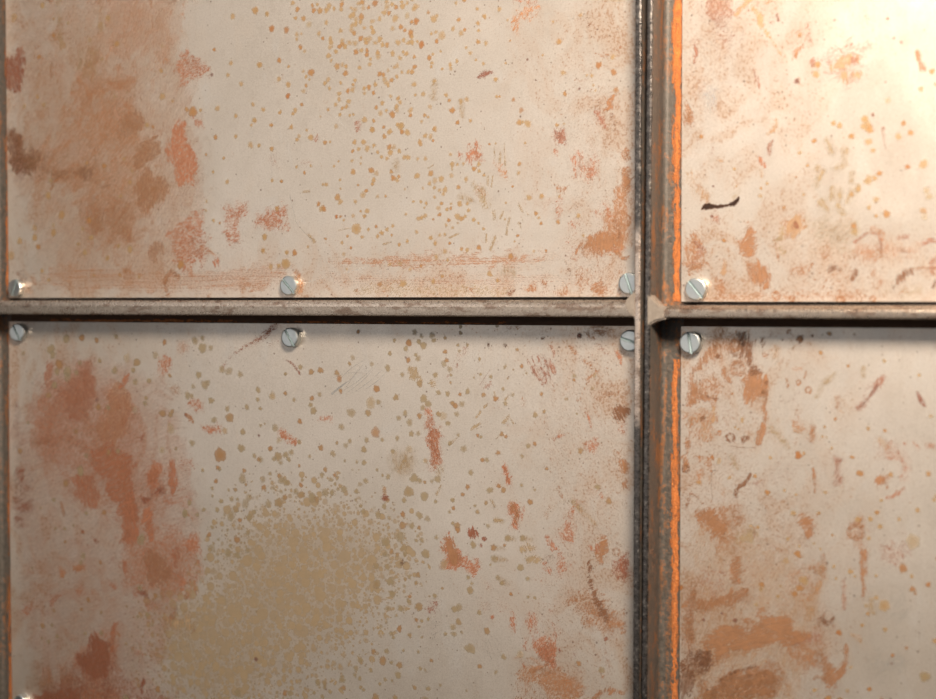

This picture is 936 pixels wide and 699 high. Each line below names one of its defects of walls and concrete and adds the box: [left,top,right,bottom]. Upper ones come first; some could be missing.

corrosion [734,0,781,55]
corrosion [5,47,26,94]
corrosion [553,128,567,153]
corrosion [5,114,42,295]
corrosion [552,147,635,297]
crack [701,196,740,210]
corrosion [822,375,887,437]
corrosion [374,474,441,611]
corrosion [669,327,851,699]
corrosion [8,514,99,699]
corrosion [313,649,402,698]